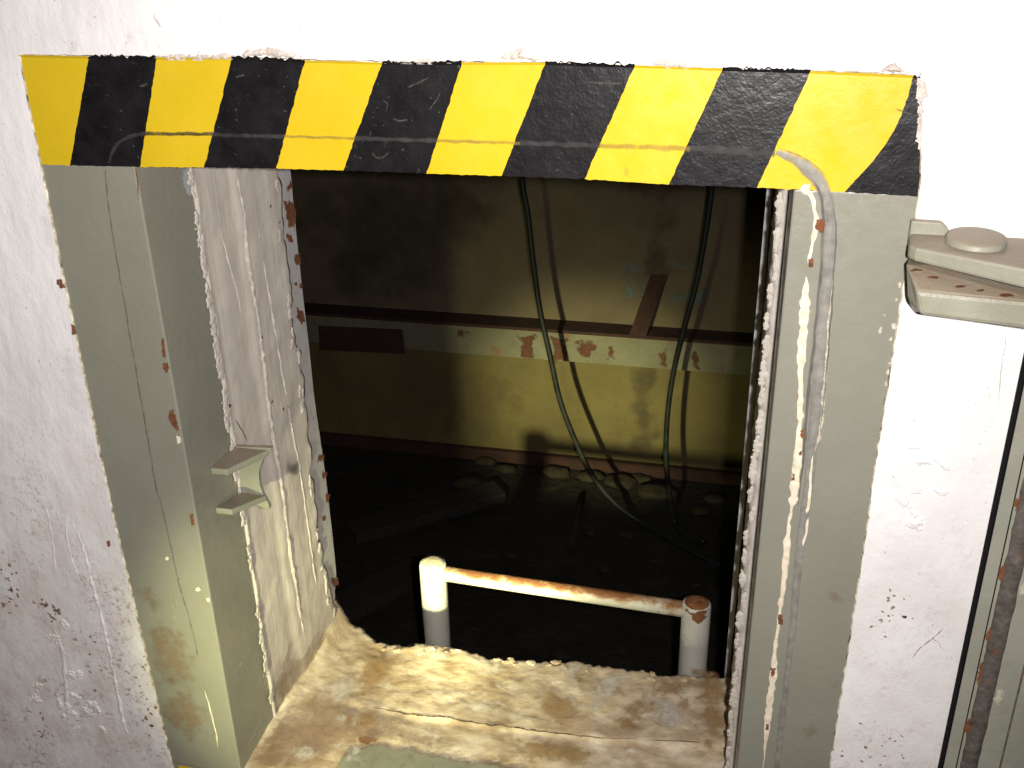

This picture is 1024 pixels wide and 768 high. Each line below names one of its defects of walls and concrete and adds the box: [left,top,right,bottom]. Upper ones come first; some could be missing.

corrosion [284,180,301,265]
spalling [187,167,235,451]
spalling [287,292,301,364]
corrosion [520,335,535,358]
corrosion [550,336,614,363]
spalling [297,384,305,414]
peeling [724,192,784,768]
peeling [763,150,837,768]
spalling [246,545,256,580]
spalling [315,527,336,618]
spalling [255,602,269,677]
crack [374,707,693,742]